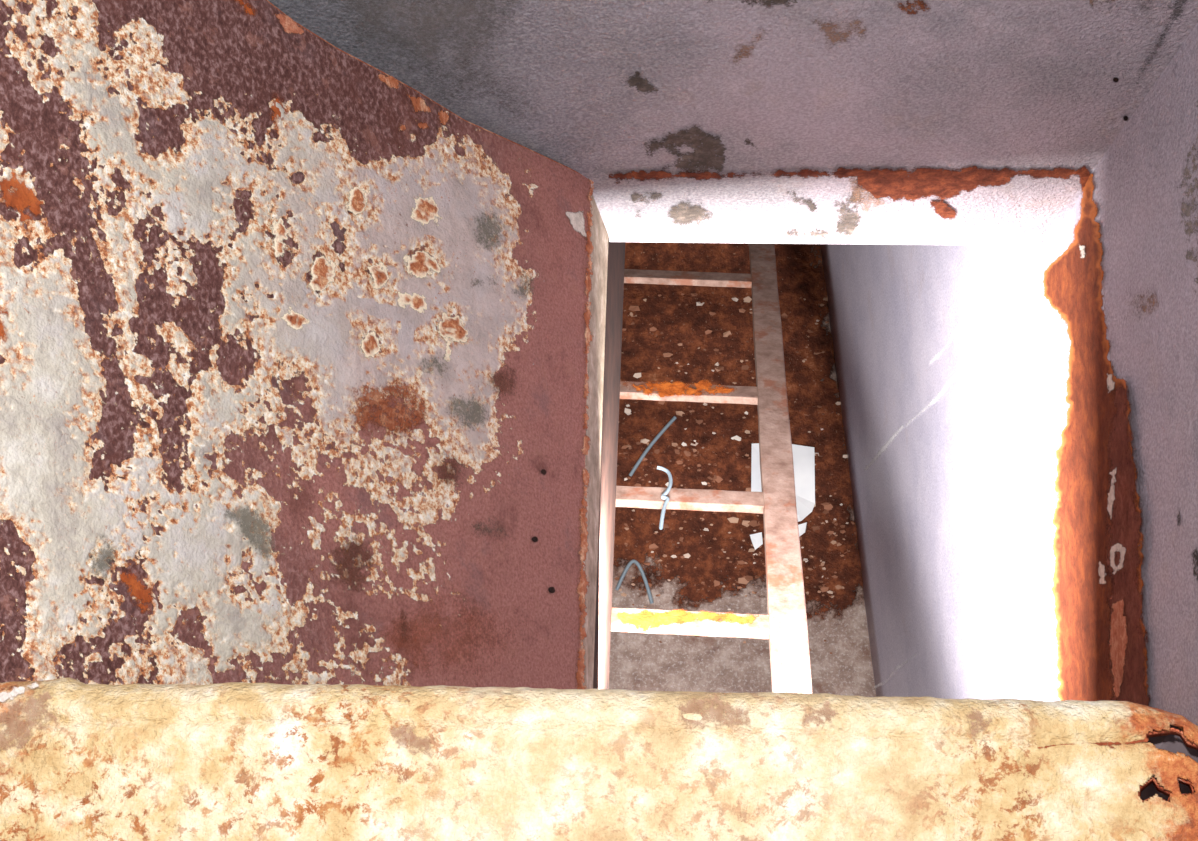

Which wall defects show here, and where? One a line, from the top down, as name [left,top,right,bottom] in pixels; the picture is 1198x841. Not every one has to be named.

peeling [0,0,539,702]
rust [1043,174,1150,706]
rust [0,692,57,751]
rust [391,727,430,754]
rust [679,695,749,729]
rust [804,701,835,726]
rust [969,711,991,737]